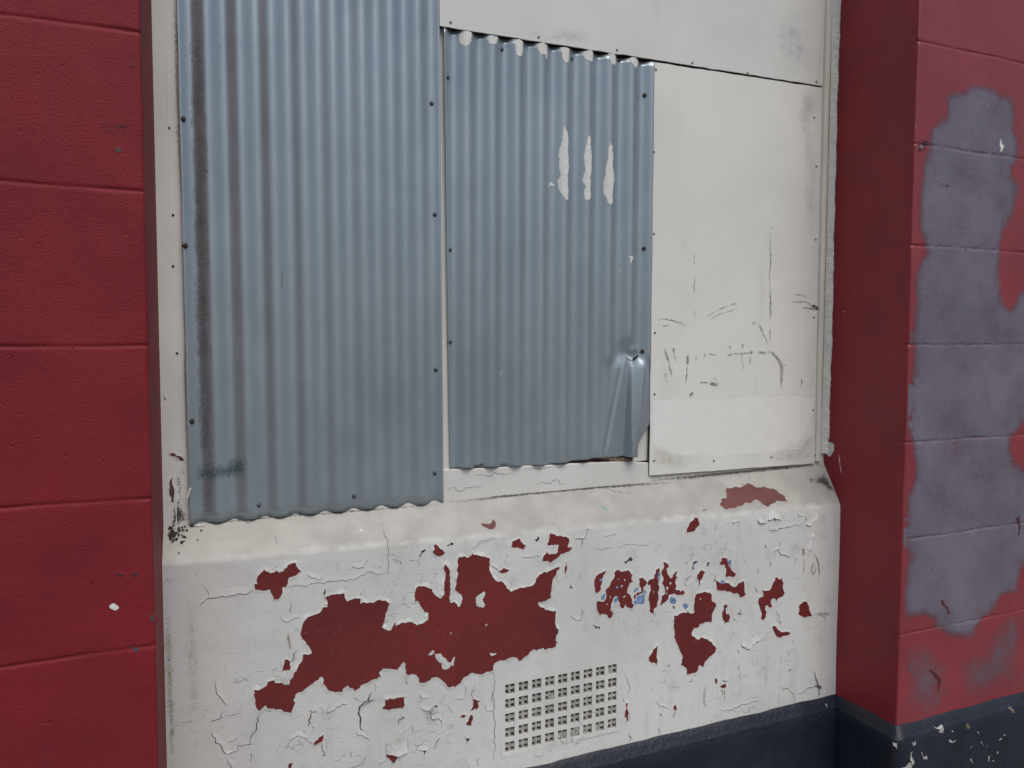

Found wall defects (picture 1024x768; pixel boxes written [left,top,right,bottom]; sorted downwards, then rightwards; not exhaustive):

peeling [717,481,790,524]
crack [200,586,254,605]
crack [282,523,401,622]
peeling [250,531,574,716]
crack [471,538,499,572]
peeling [591,556,791,677]
crack [733,512,815,626]
peeling [797,598,814,620]
crack [183,681,265,768]
crack [287,691,387,768]
crack [398,673,498,760]